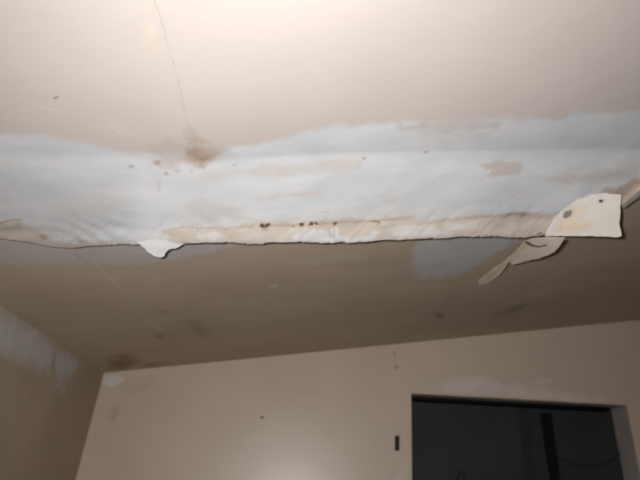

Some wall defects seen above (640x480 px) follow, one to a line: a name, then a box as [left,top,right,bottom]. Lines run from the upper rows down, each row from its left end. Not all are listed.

peeling [0,210,561,257]
water stain [148,195,593,284]